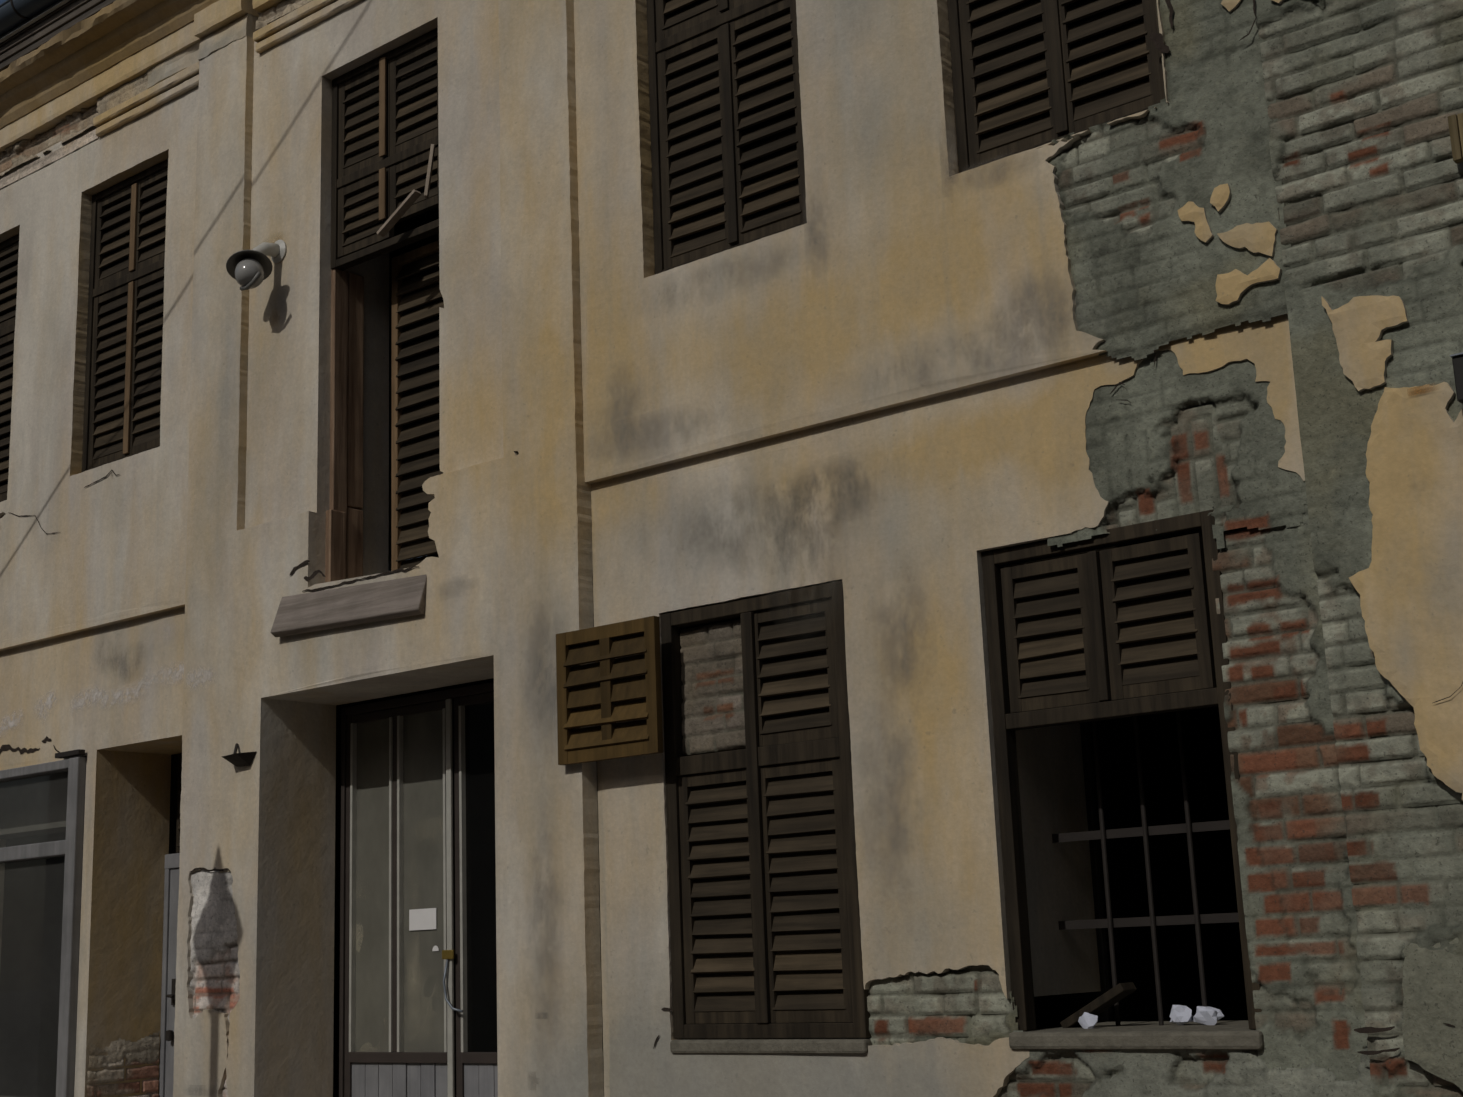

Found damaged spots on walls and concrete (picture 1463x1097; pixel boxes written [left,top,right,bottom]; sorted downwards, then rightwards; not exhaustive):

spalling [997,0,1463,1097]
crack [0,736,60,755]
spalling [190,870,240,1023]
spalling [865,965,1023,1046]
spalling [87,1031,160,1097]